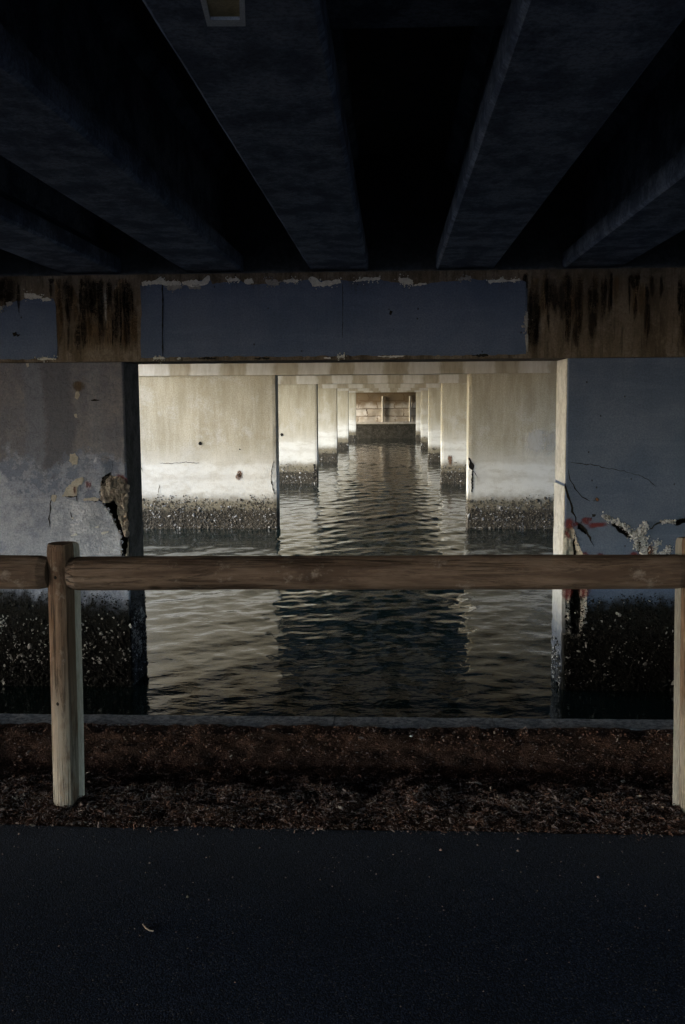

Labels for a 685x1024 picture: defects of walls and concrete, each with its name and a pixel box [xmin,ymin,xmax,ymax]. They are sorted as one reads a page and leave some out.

peeling [142,275,210,293]
peeling [225,276,381,289]
peeling [394,274,426,288]
leakage [49,279,137,348]
leakage [522,273,663,347]
crack [468,458,478,492]
peeling [50,472,130,557]
crack [565,462,655,546]
spalling [592,511,685,555]